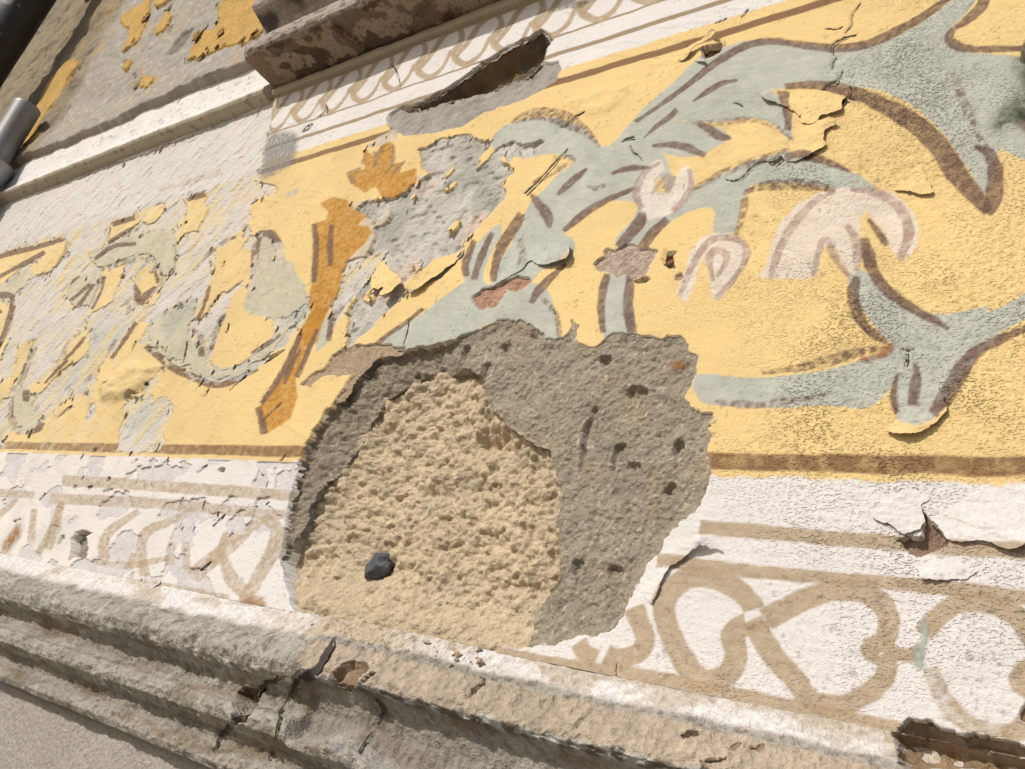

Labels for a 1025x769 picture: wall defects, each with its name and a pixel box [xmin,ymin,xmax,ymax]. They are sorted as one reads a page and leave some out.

flaking render [0,0,264,170]
crack [822,3,861,109]
peeling [0,103,313,521]
flaking render [71,31,719,667]
peeling [872,481,1025,581]
crack [212,724,230,751]
crack [258,637,334,760]
crack [358,699,385,754]
spalling [891,721,1025,769]